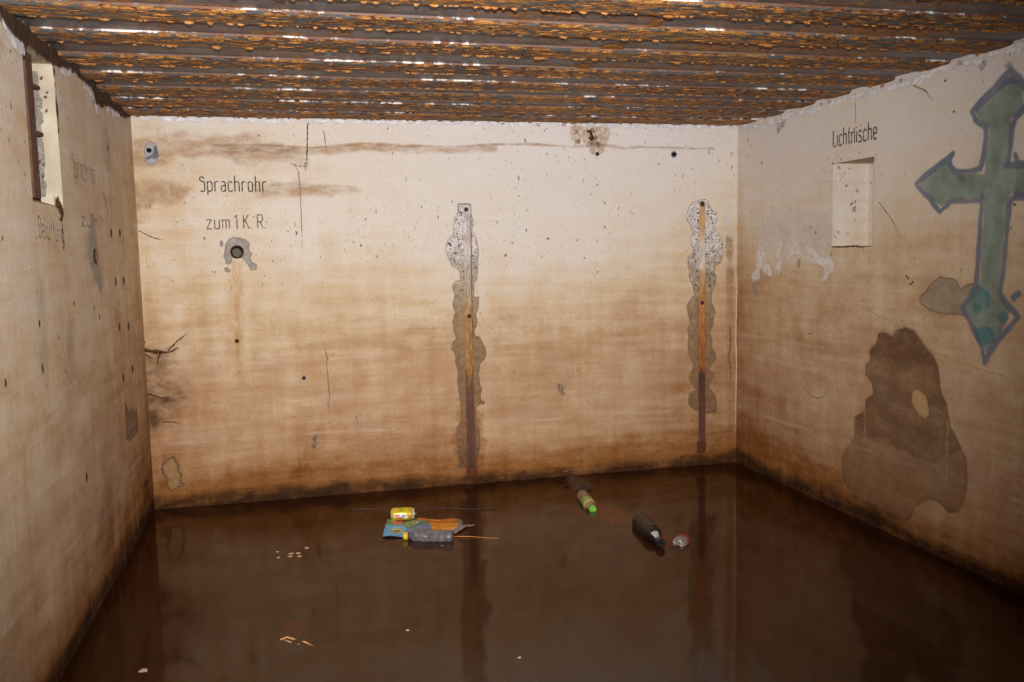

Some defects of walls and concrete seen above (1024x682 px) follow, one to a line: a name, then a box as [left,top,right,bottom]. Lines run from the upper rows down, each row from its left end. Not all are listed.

corrosion [68,8,216,25]
corrosion [361,0,641,15]
corrosion [95,5,979,154]
peeling [751,241,834,296]
flaking render [686,199,723,414]
flaking render [446,204,486,467]
water stain [911,389,929,419]